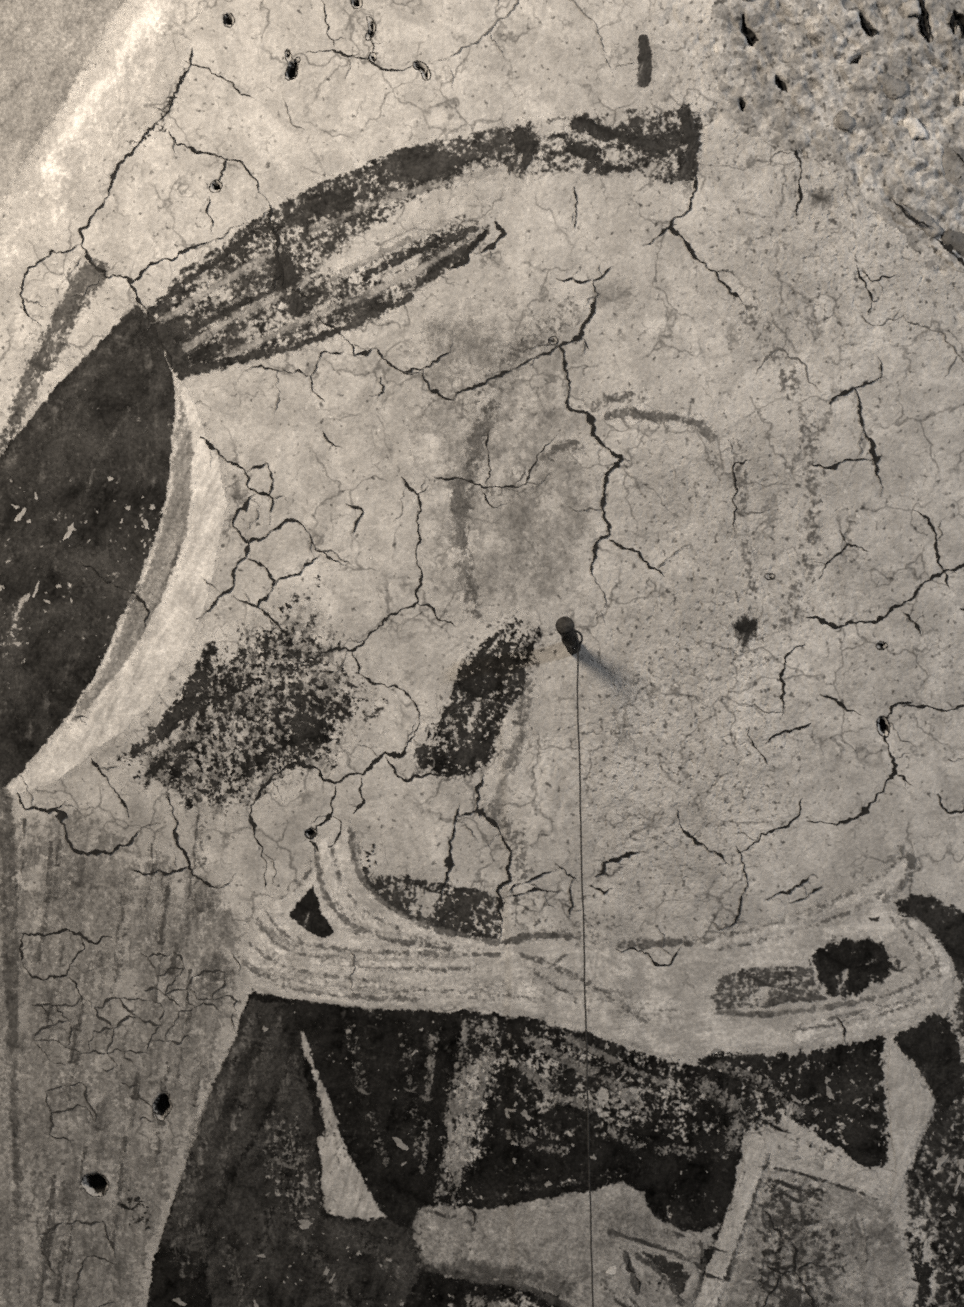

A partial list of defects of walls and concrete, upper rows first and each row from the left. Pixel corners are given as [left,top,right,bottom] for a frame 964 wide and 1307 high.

crack [307,0,518,91]
crack [644,172,747,317]
crack [769,148,803,219]
spalling [707,0,964,277]
crack [857,267,964,379]
crack [15,49,690,938]
crack [722,439,764,527]
crack [757,347,889,497]
crack [671,510,964,932]
crack [616,924,683,966]
crack [19,928,241,1146]
crack [38,1220,119,1307]